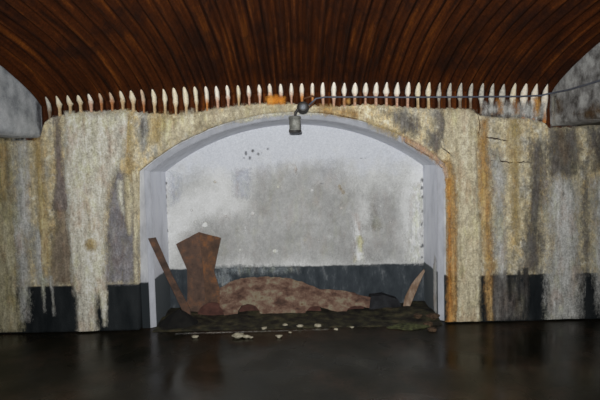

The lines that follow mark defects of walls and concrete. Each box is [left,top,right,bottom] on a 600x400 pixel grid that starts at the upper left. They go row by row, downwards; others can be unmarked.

leakage [0,102,138,333]
leakage [393,112,419,134]
rust [443,160,457,322]
rust [478,119,494,321]
crack [470,108,534,163]
leakage [492,127,600,321]